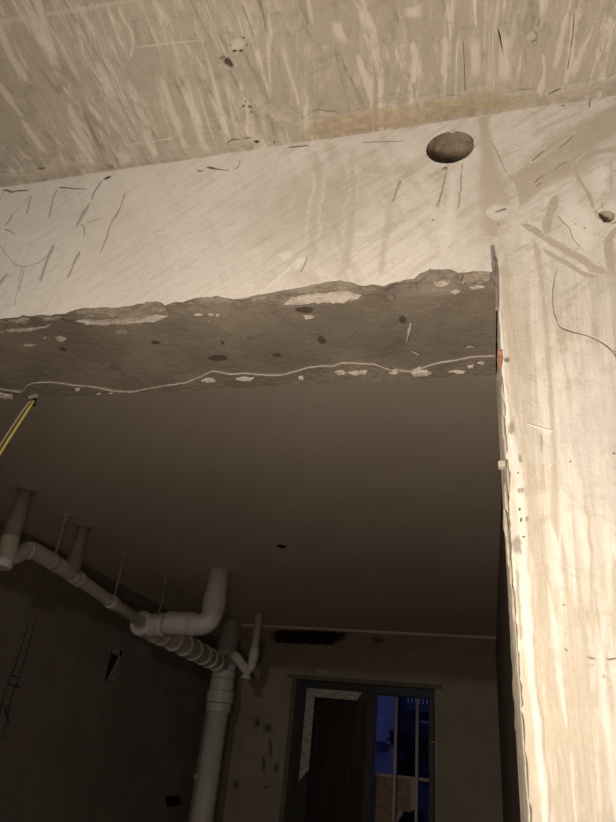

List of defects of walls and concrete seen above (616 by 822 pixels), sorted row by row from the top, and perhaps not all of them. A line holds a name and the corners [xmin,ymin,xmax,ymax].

flaking render [0,245,550,822]
crack [552,268,616,358]